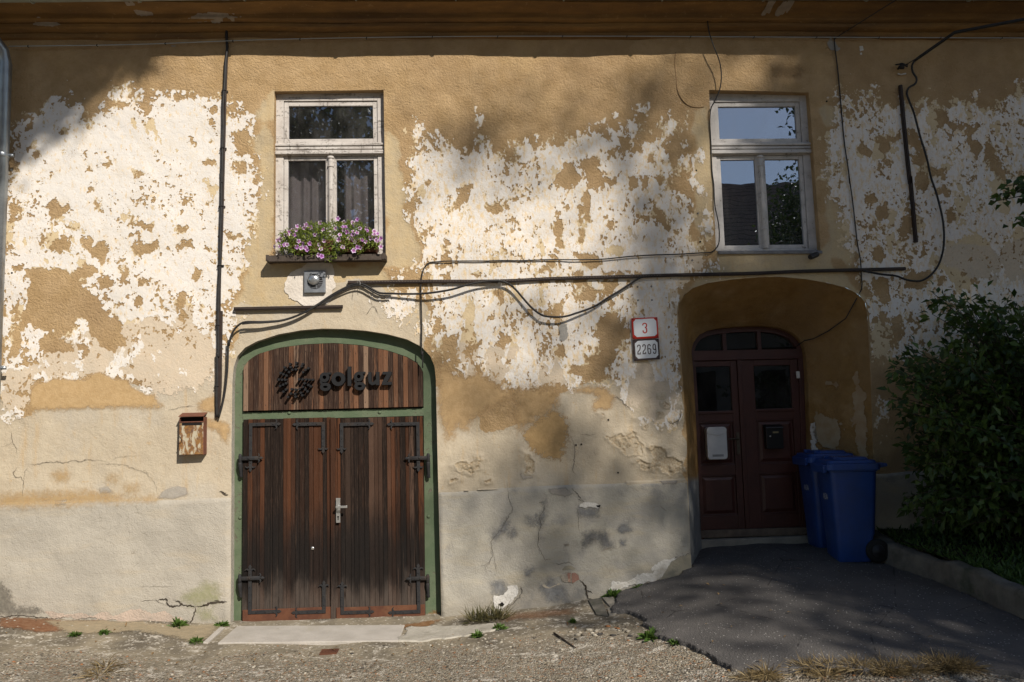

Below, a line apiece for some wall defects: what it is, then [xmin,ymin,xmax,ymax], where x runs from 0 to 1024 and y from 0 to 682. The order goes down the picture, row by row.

peeling [0,80,270,430]
peeling [368,101,724,491]
peeling [816,73,1024,367]
crack [140,586,227,623]
flaking render [493,585,518,609]
flaking render [609,554,691,590]